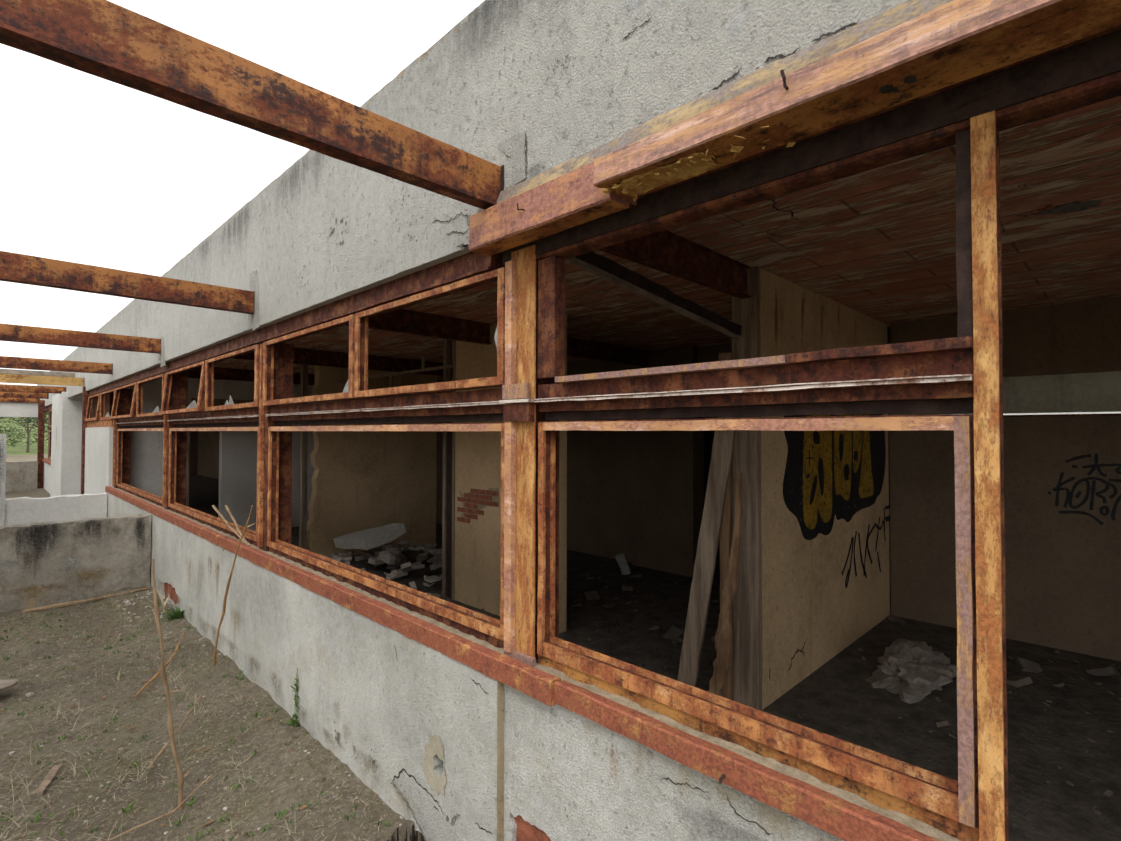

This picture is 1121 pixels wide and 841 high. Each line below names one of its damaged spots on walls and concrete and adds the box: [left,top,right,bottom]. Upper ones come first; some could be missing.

peeling [600,135,745,202]
flaking render [457,488,499,523]
water stain [16,524,59,555]
water stain [136,519,145,540]
spalling [422,734,447,797]
crack [391,769,442,811]
flaking render [513,815,551,841]